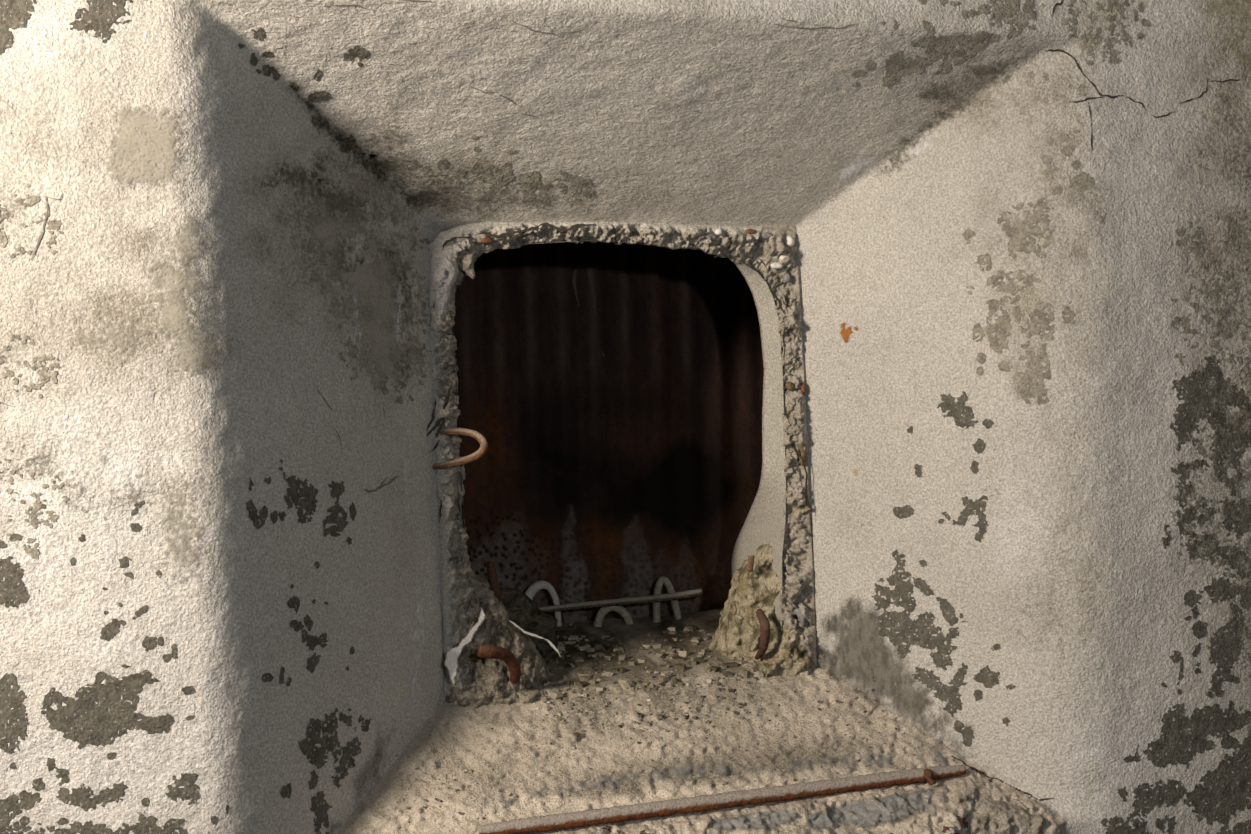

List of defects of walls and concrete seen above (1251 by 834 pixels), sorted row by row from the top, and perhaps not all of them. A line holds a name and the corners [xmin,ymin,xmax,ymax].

peeling [69,0,132,43]
crack [1047,49,1242,150]
leakage [267,83,556,392]
spalling [302,179,817,707]
peeling [0,449,69,608]
peeling [1101,215,1251,834]
peeling [0,664,195,769]
leakage [824,600,936,731]
peeling [871,549,1016,747]
peeling [0,758,187,834]
rust [478,765,968,834]
spalling [529,768,1066,834]